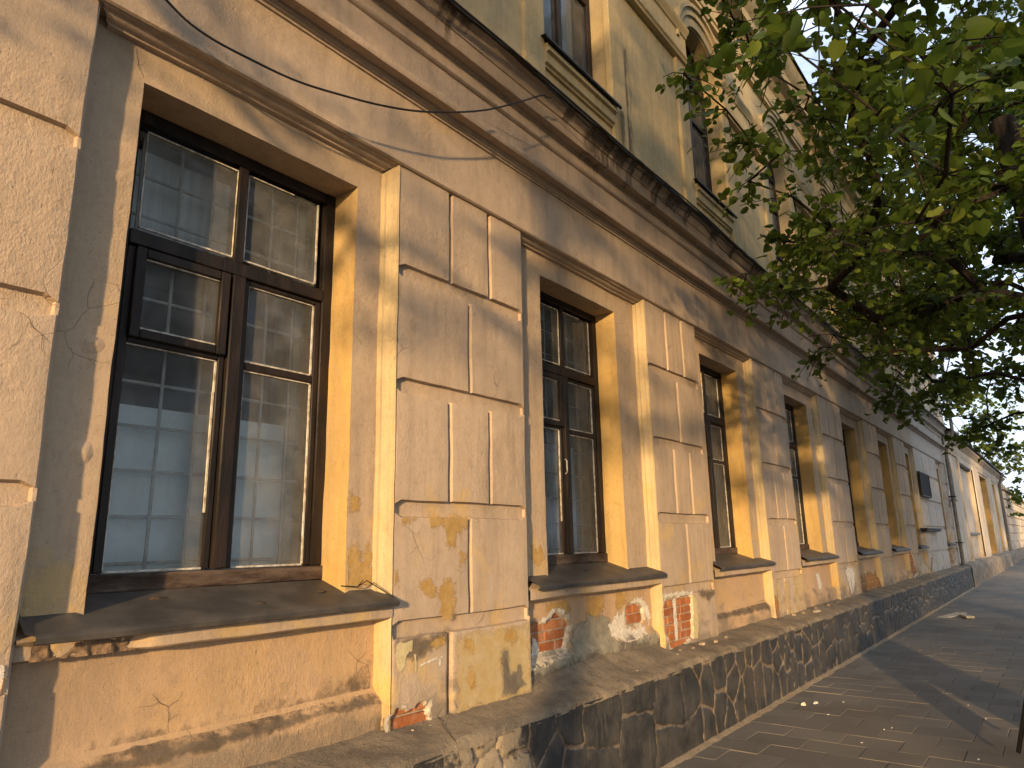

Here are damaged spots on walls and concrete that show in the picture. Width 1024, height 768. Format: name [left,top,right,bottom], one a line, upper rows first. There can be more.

peeling [347,543,373,588]
peeling [430,513,469,566]
peeling [420,578,456,621]
spalling [586,590,699,650]
spalling [29,636,138,663]
peeling [395,600,573,713]
water stain [501,614,661,695]
spalling [381,699,434,733]